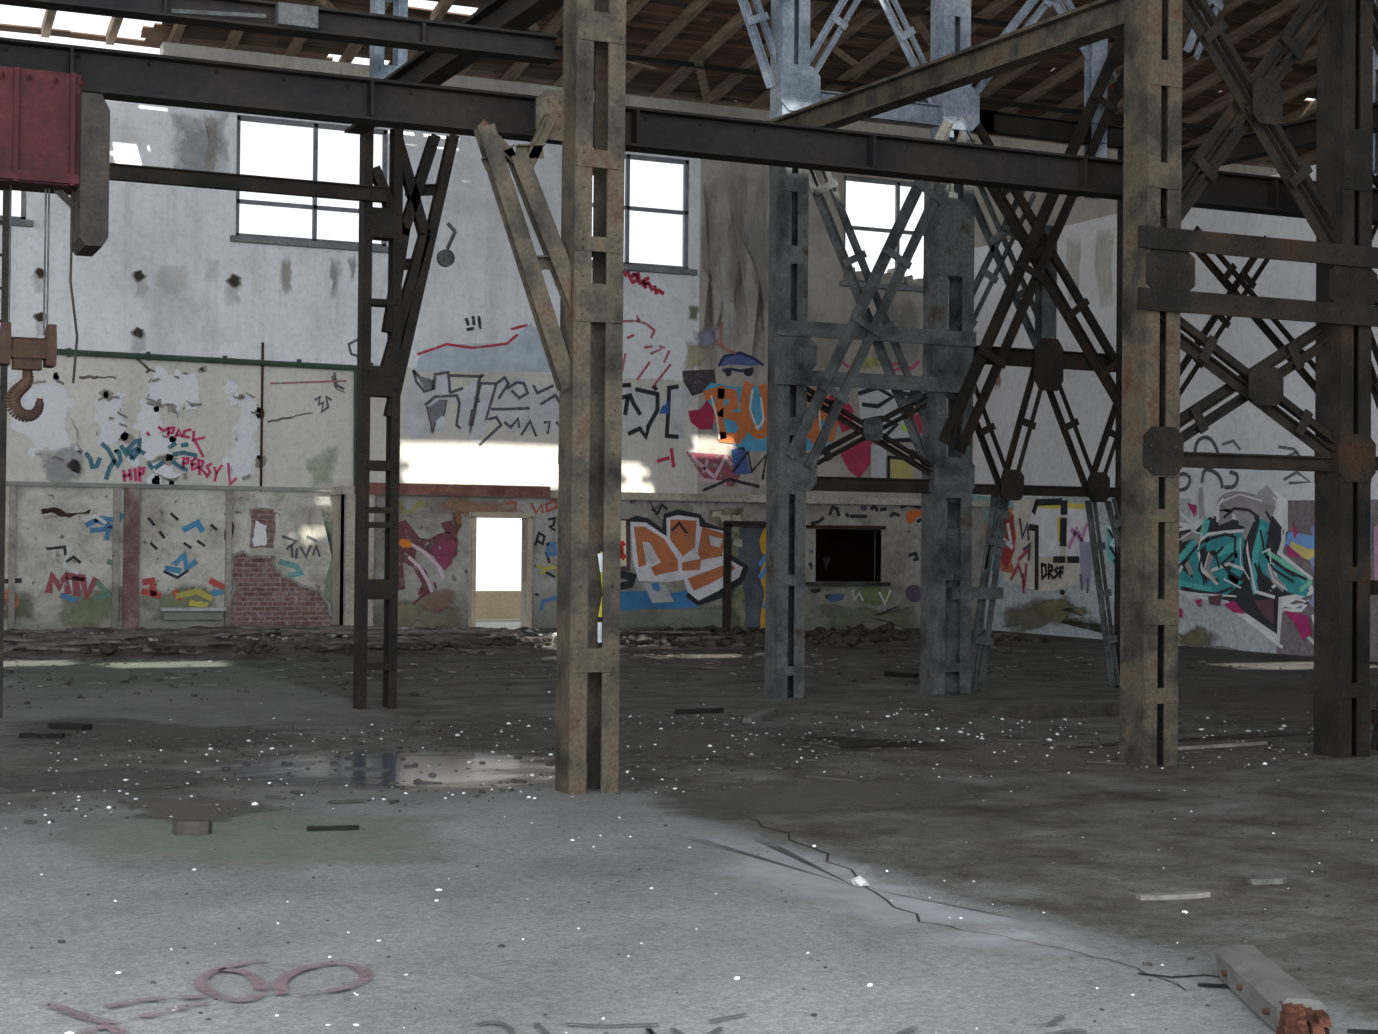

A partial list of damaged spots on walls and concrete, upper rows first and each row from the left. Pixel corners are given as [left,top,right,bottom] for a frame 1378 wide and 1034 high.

peeling [7,365,207,485]
peeling [222,380,267,486]
spalling [224,508,333,627]